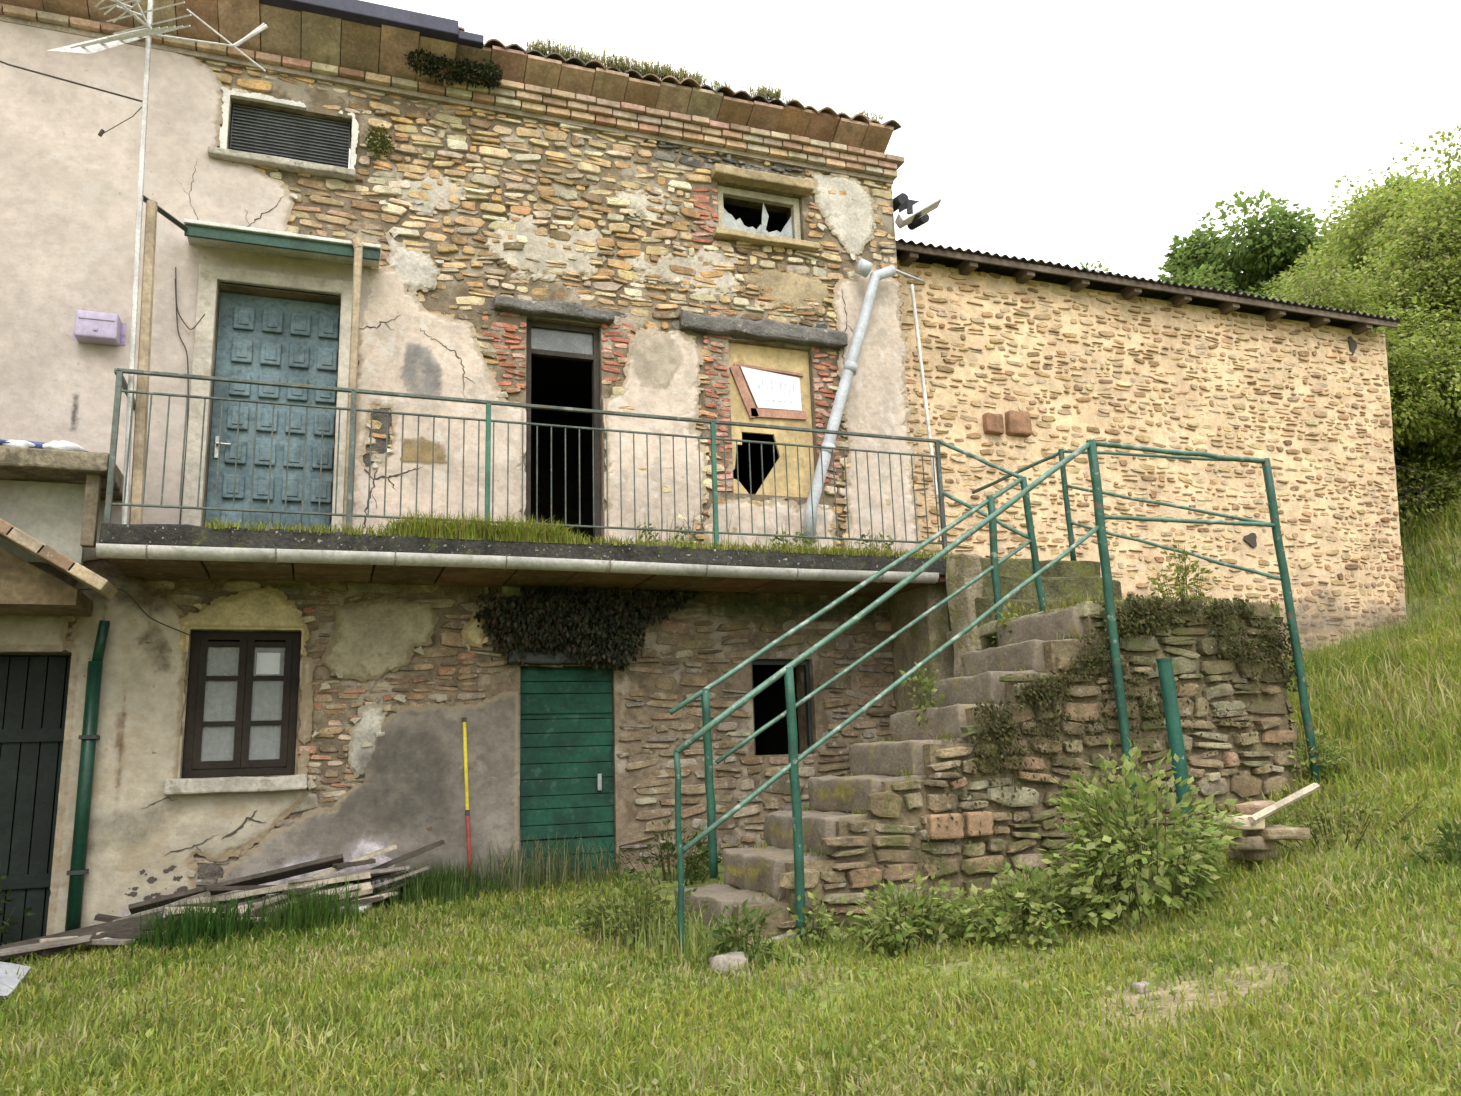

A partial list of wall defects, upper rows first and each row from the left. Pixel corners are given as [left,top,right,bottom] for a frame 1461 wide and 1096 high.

crack [246,196,284,227]
crack [359,315,475,398]
flaking render [363,409,393,468]
flaking render [178,585,494,808]
crack [165,810,266,856]